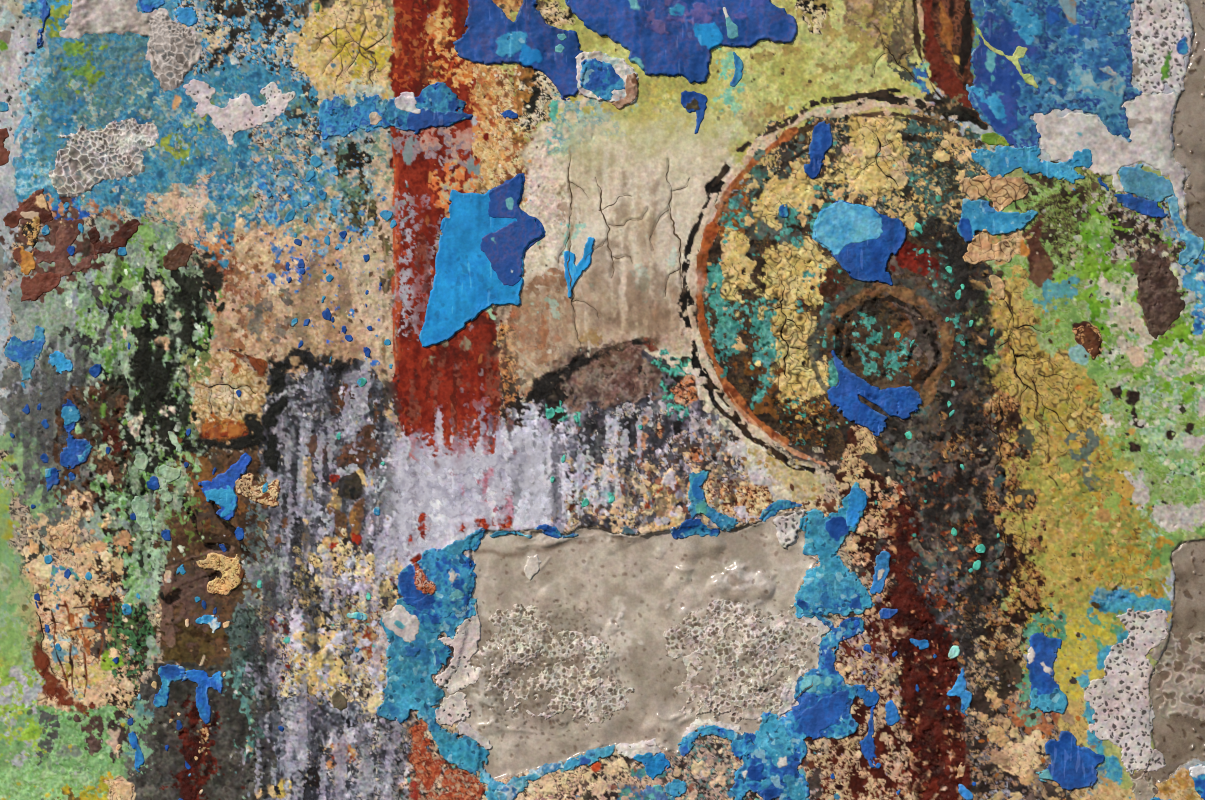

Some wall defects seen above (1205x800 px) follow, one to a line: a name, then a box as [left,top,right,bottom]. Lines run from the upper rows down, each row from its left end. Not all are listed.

crack [855,131,898,186]
peeling [957,0,1205,339]
crack [558,158,689,344]
damp [531,350,610,402]
crack [770,280,812,378]
damp [294,524,315,560]
damp [388,432,552,554]
damp [256,575,278,678]
damp [297,575,331,669]
spalling [347,470,901,800]
rust [872,505,971,800]
damp [305,786,318,800]